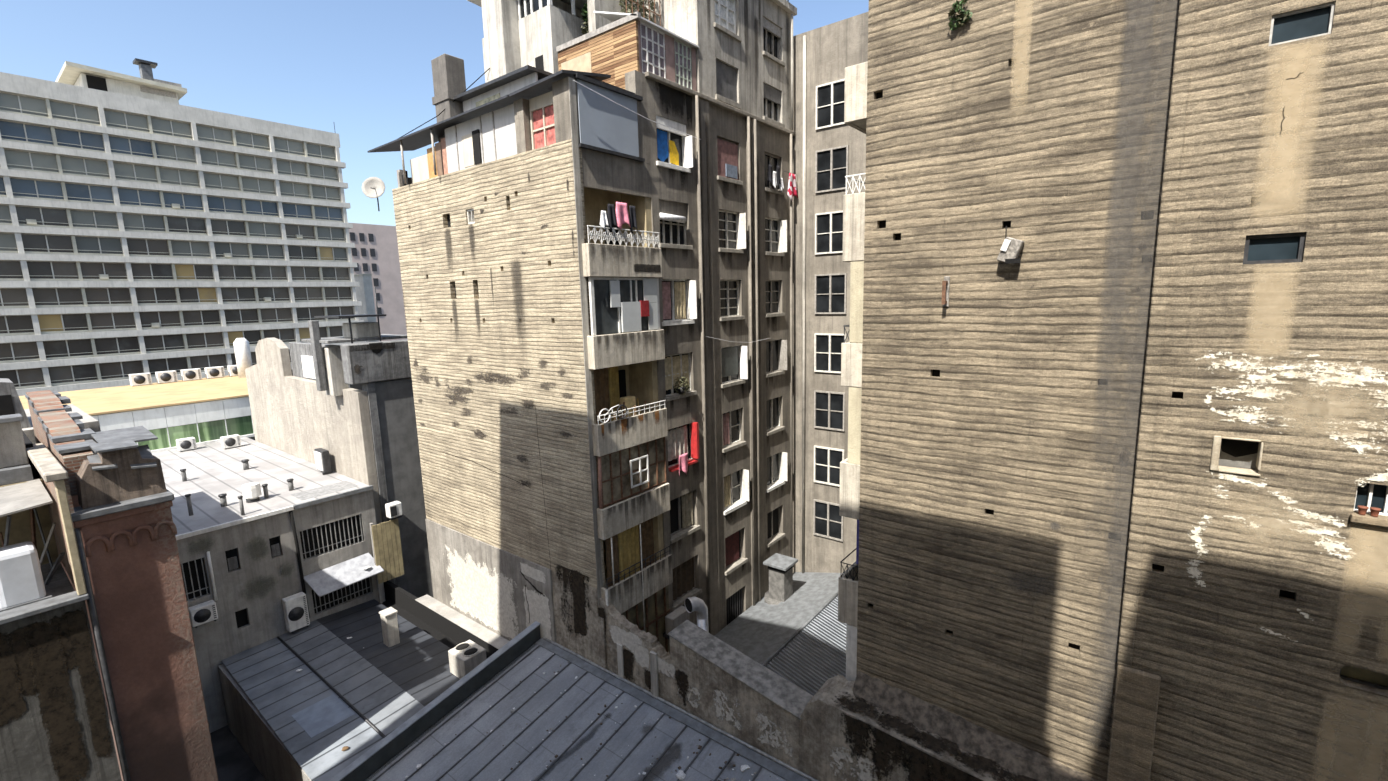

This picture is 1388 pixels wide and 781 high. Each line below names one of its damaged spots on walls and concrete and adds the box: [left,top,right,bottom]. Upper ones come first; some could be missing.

water stain [475,268,493,330]
water stain [512,262,522,327]
efflorescence [1195,350,1388,487]
efflorescence [1185,471,1357,587]
water stain [555,531,696,636]
water stain [841,712,983,781]